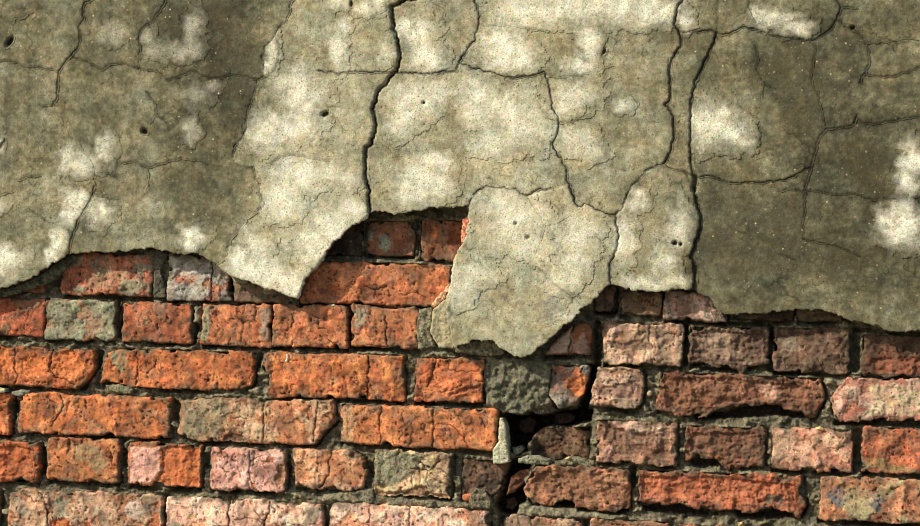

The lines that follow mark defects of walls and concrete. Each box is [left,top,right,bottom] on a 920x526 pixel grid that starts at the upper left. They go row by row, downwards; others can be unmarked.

crack [0,0,293,158]
crack [0,175,41,196]
spalling [0,253,81,298]
spalling [0,347,88,380]
crack [68,142,207,254]
crack [210,154,329,301]
spalling [417,284,505,356]
crack [318,0,920,298]
spalling [661,303,816,421]
spalling [156,445,201,487]
crack [491,323,601,526]
spalling [640,456,797,520]